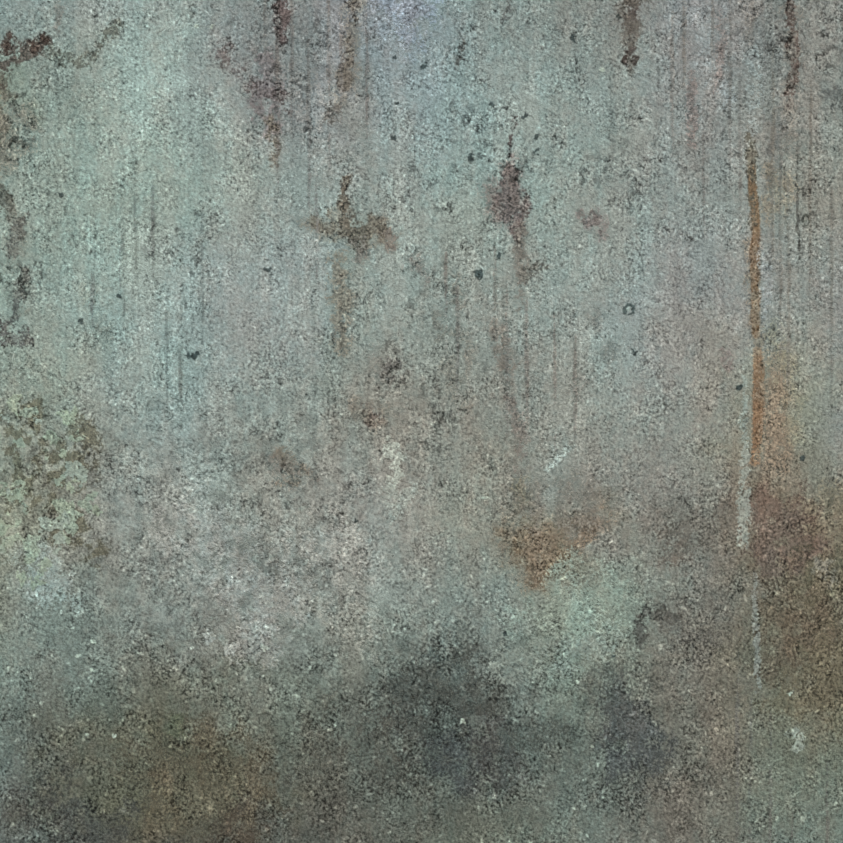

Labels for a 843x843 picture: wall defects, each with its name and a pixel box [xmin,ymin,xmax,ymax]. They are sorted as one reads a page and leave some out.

corrosion [0,18,124,74]
corrosion [215,41,292,167]
corrosion [271,0,297,45]
corrosion [336,36,354,92]
corrosion [618,0,644,72]
corrosion [311,174,398,357]
corrosion [492,116,548,310]
corrosion [744,128,761,338]
corrosion [750,348,796,468]
water stain [633,604,683,648]
water stain [370,635,579,801]
water stain [594,673,677,783]